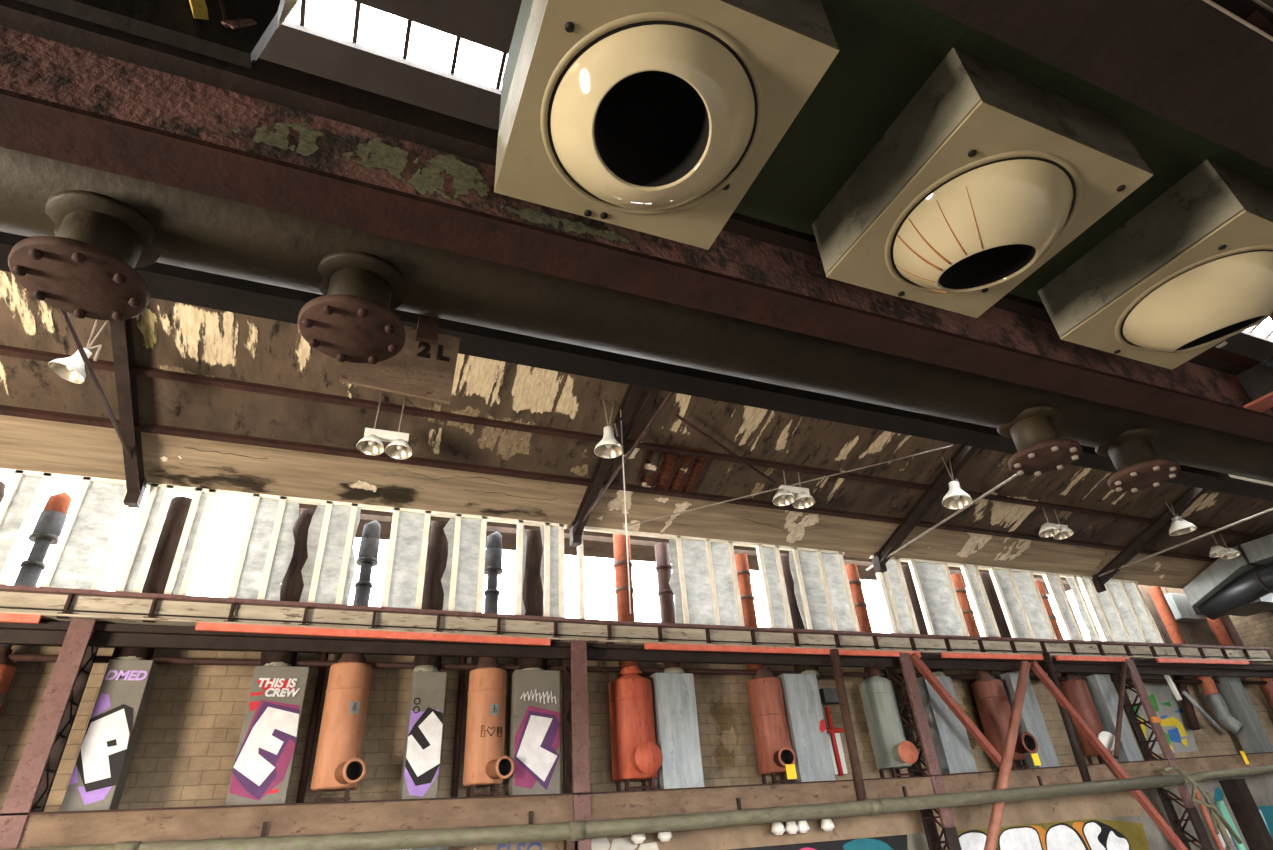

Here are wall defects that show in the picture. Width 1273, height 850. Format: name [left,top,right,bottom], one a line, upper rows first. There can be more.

peeling [0,271,54,335]
peeling [136,303,258,377]
peeling [295,330,311,371]
leakage [150,467,271,492]
leakage [336,480,415,507]
peeling [422,353,579,460]
spalling [597,393,713,533]
peeling [731,406,775,451]
peeling [775,420,801,453]
peeling [813,431,911,501]
spalling [784,510,819,543]
peeling [956,491,1038,561]